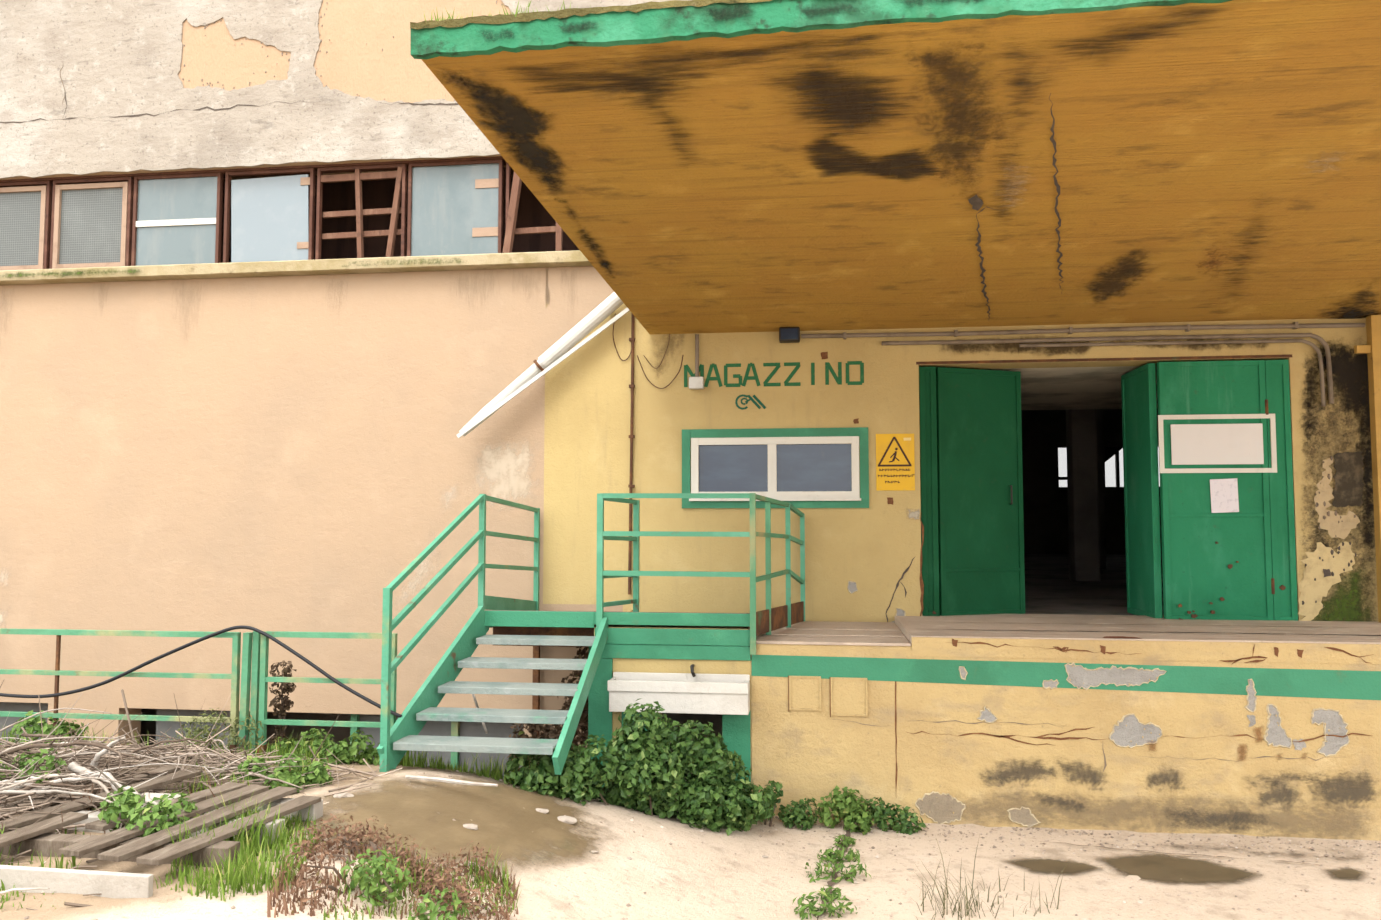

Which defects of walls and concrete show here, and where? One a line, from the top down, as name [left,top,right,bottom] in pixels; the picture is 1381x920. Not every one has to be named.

crack [0,67,304,123]
peeling [178,18,291,91]
peeling [314,0,512,103]
damp [447,76,563,191]
damp [512,35,1002,180]
crack [1049,93,1064,293]
mould [1303,344,1374,548]
peeling [1042,636,1166,690]
crack [830,681,1107,786]
peeling [1109,713,1162,748]
peeling [1244,679,1350,757]
damp [967,796,1359,838]